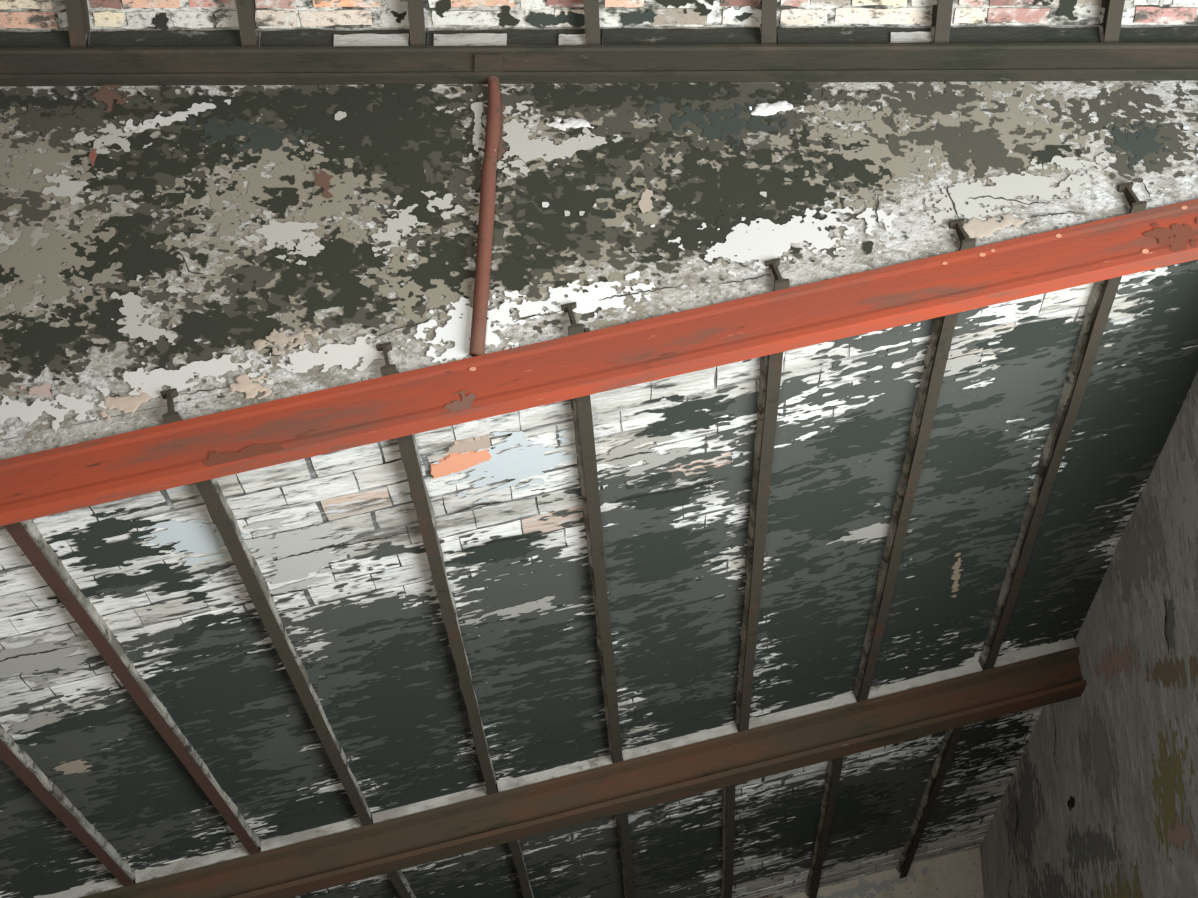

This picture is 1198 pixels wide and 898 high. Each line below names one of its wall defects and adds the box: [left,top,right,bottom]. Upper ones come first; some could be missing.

rust [638,189,654,214]
spalling [963,214,1025,257]
spalling [253,326,319,355]
spalling [229,372,272,399]
spalling [94,389,153,420]
spalling [430,436,491,479]
spalling [54,759,92,775]